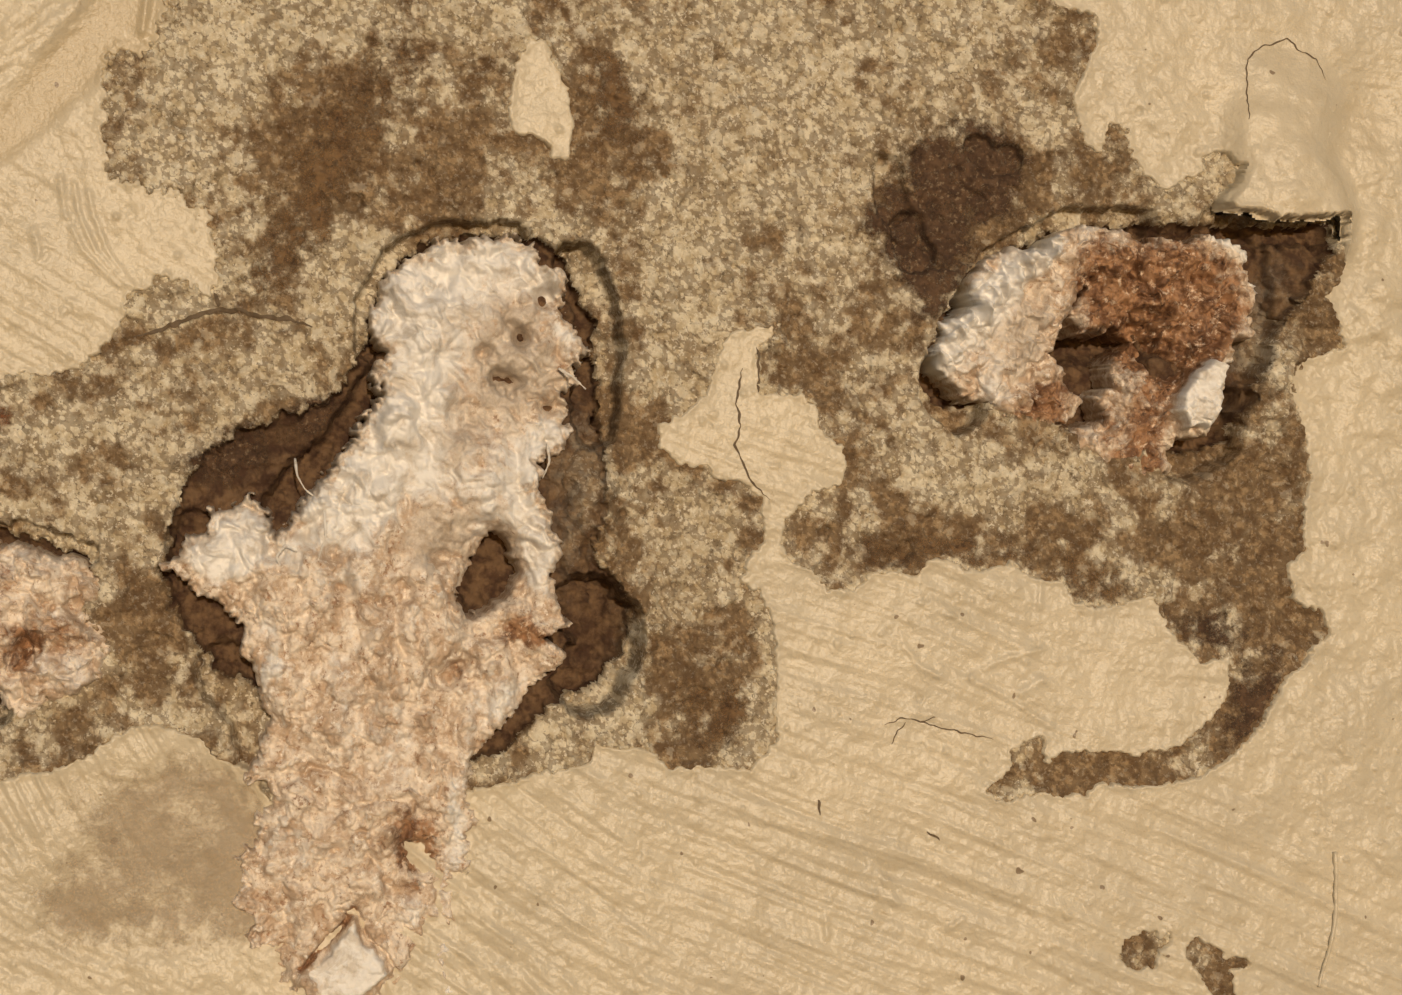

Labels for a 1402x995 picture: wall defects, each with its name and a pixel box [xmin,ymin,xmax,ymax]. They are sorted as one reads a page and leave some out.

crack [1246,38,1326,118]
damp [862,116,1258,475]
spalling [0,0,1346,803]
damp [0,539,111,718]
damp [157,232,591,995]
peeling [1120,931,1170,970]
peeling [1186,937,1249,995]